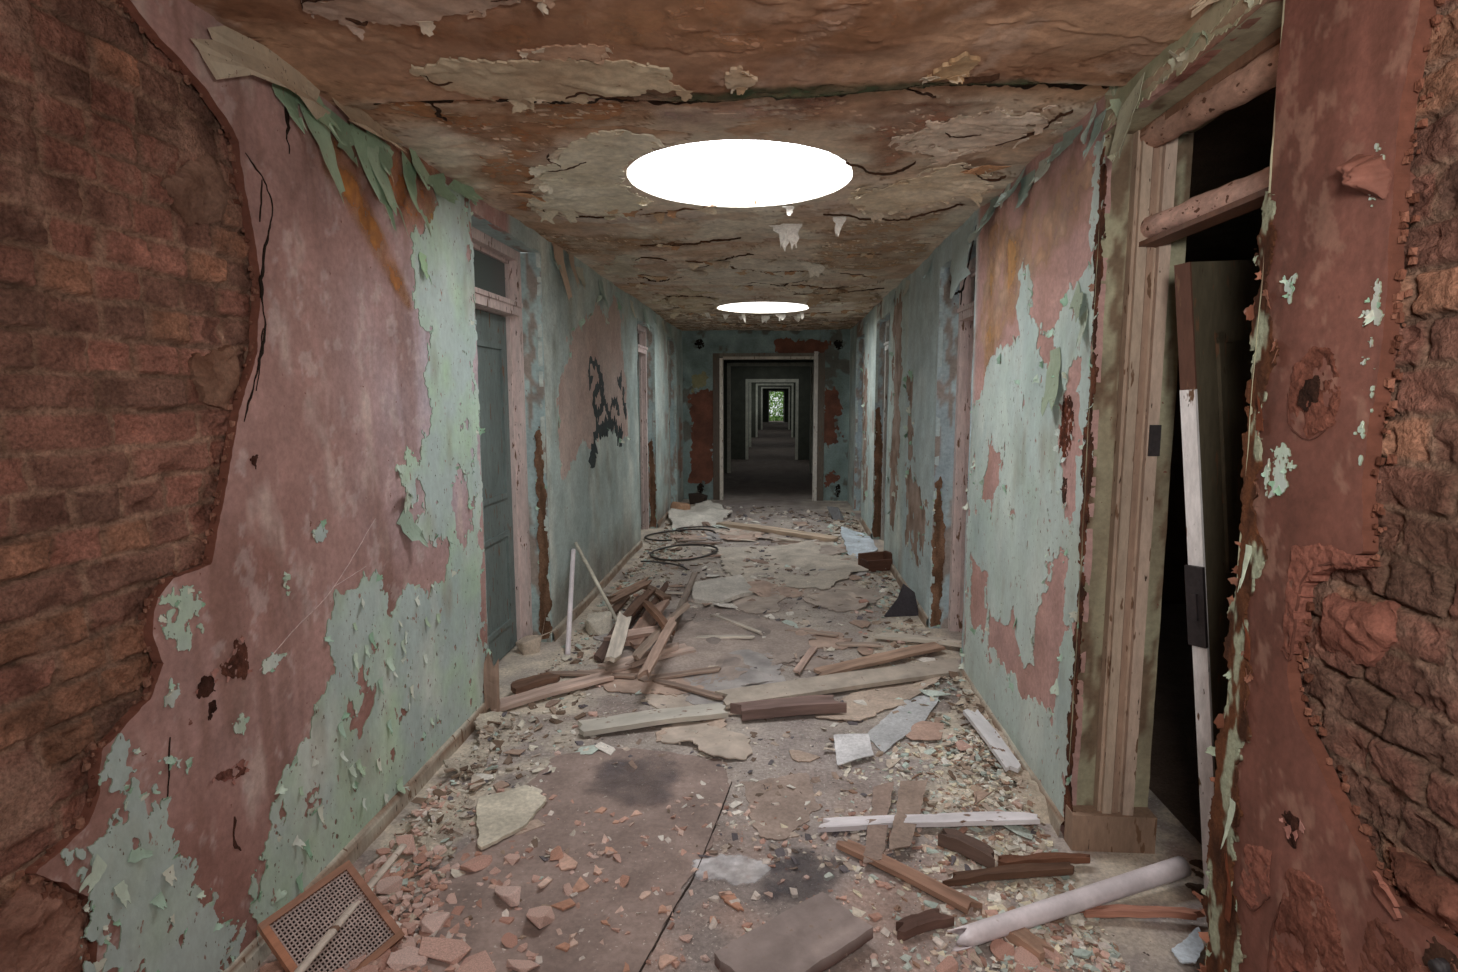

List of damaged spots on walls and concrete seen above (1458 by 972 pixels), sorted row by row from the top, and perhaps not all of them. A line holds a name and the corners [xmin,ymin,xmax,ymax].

flaking render [301,0,556,40]
crack [374,97,737,121]
flaking render [724,65,758,95]
crack [906,83,1110,98]
peeling [511,129,717,224]
crack [244,105,290,422]
crack [949,225,977,305]
peeling [534,206,946,639]
peeling [820,0,1262,827]
flaking render [0,0,492,972]
flaking render [1231,0,1458,972]
peeling [1192,870,1230,972]